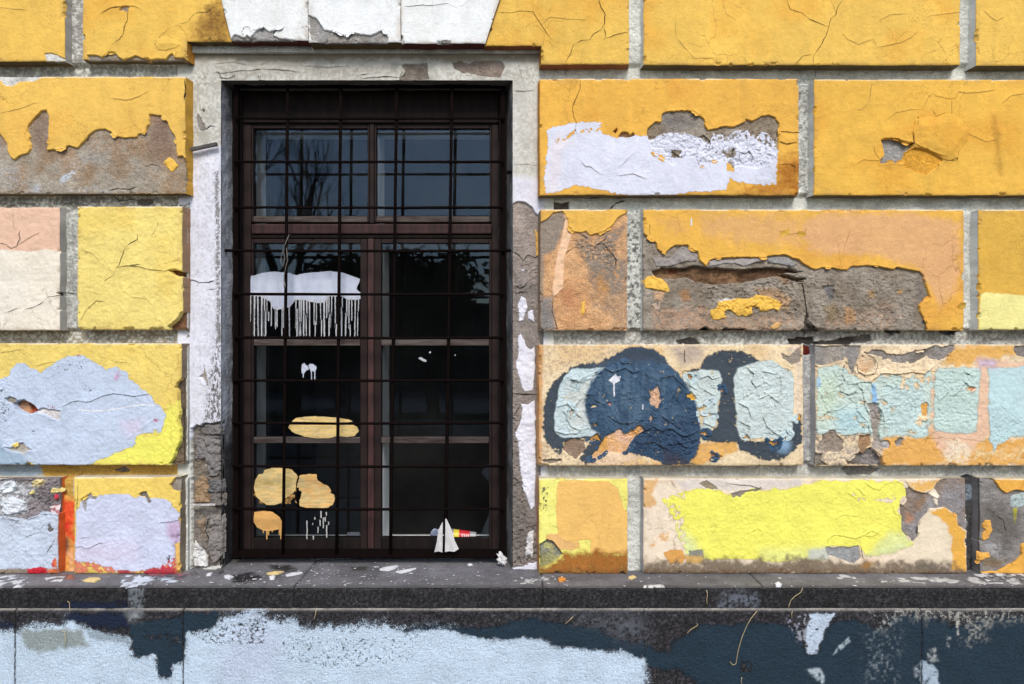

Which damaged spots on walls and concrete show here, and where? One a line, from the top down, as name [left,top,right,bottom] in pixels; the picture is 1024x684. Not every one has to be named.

peeling [309,16,389,45]
crack [501,1,625,131]
crack [787,1,915,74]
peeling [0,111,188,206]
flaking render [647,108,782,168]
crack [9,224,179,319]
flaking render [642,234,957,377]
peeling [513,202,728,567]
flaking render [0,477,66,532]
flaking render [171,379,234,580]
flaking render [813,403,903,475]
flaking render [899,475,1024,572]